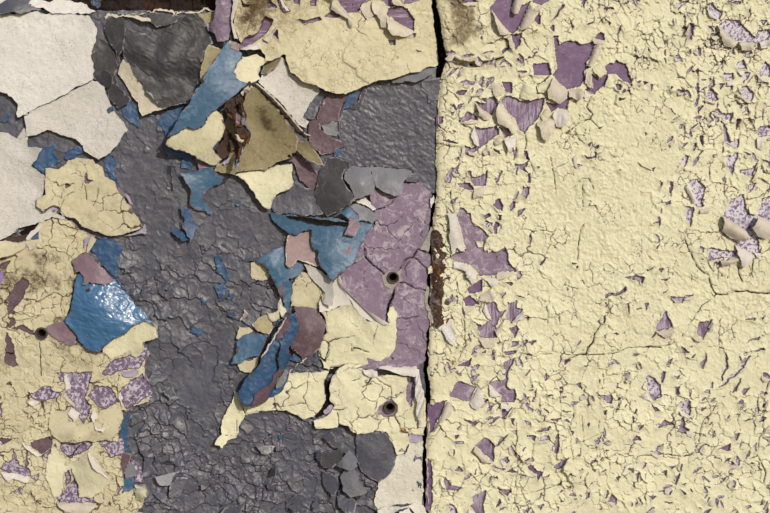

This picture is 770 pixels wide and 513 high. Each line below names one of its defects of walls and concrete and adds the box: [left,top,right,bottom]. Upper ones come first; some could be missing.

crack [431,0,472,78]
peeling [445,0,631,216]
peeling [677,0,770,267]
peeling [0,0,529,513]
rust [428,230,452,329]
peeling [605,269,648,297]
crack [685,241,770,325]
crack [318,337,392,399]
crack [364,191,454,513]
crack [532,300,673,362]
peeling [640,371,665,411]
peeling [527,410,566,468]